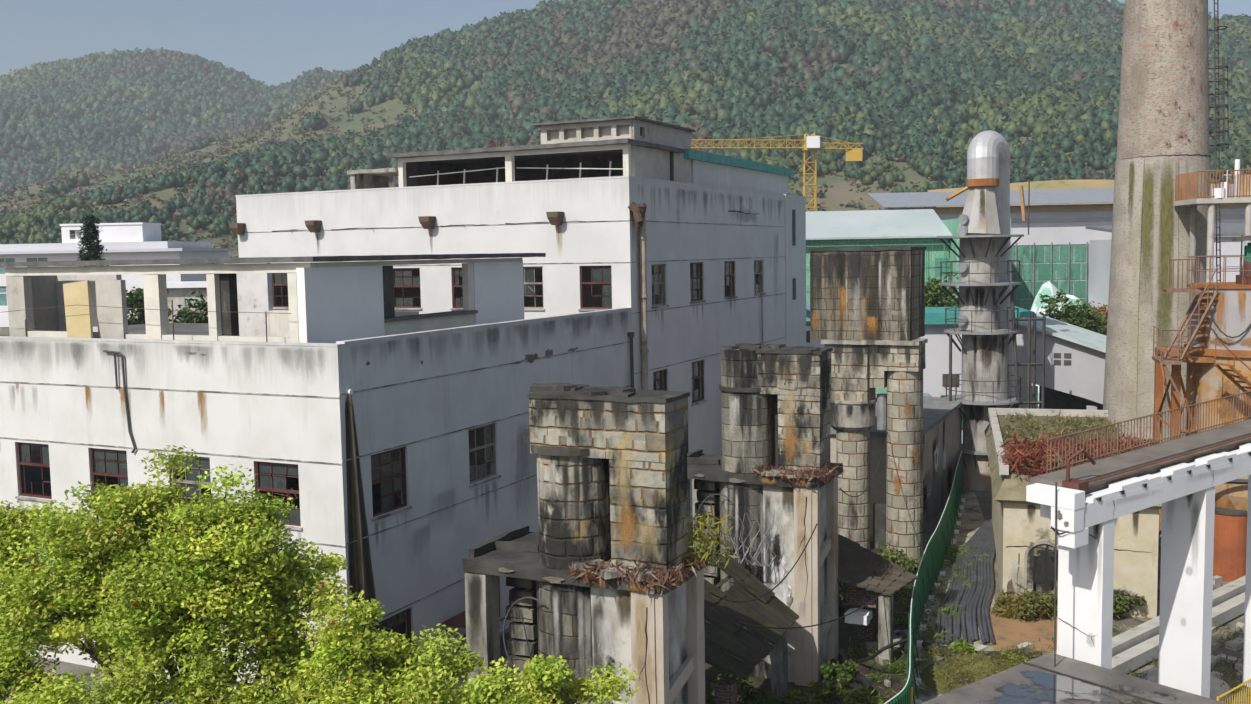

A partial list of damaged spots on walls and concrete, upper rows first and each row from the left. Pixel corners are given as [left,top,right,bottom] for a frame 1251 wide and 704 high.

leakage [1129,164,1153,272]
corrosion [1204,293,1224,320]
corrosion [1199,336,1251,346]
crack [638,607,650,704]